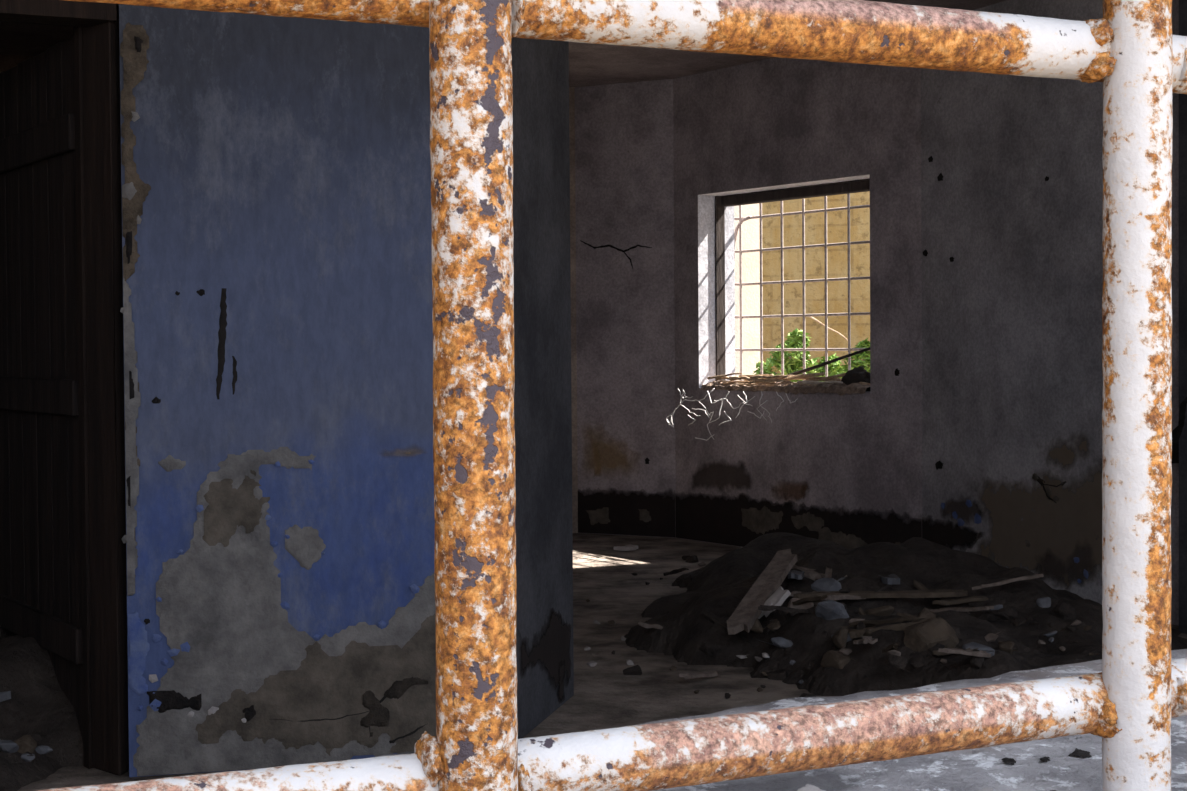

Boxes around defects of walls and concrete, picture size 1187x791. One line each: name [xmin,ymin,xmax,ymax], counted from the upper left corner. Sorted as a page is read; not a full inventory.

flaking render [120,22,161,596]
crack [580,240,652,269]
peeling [128,447,436,776]
damp [578,463,981,549]